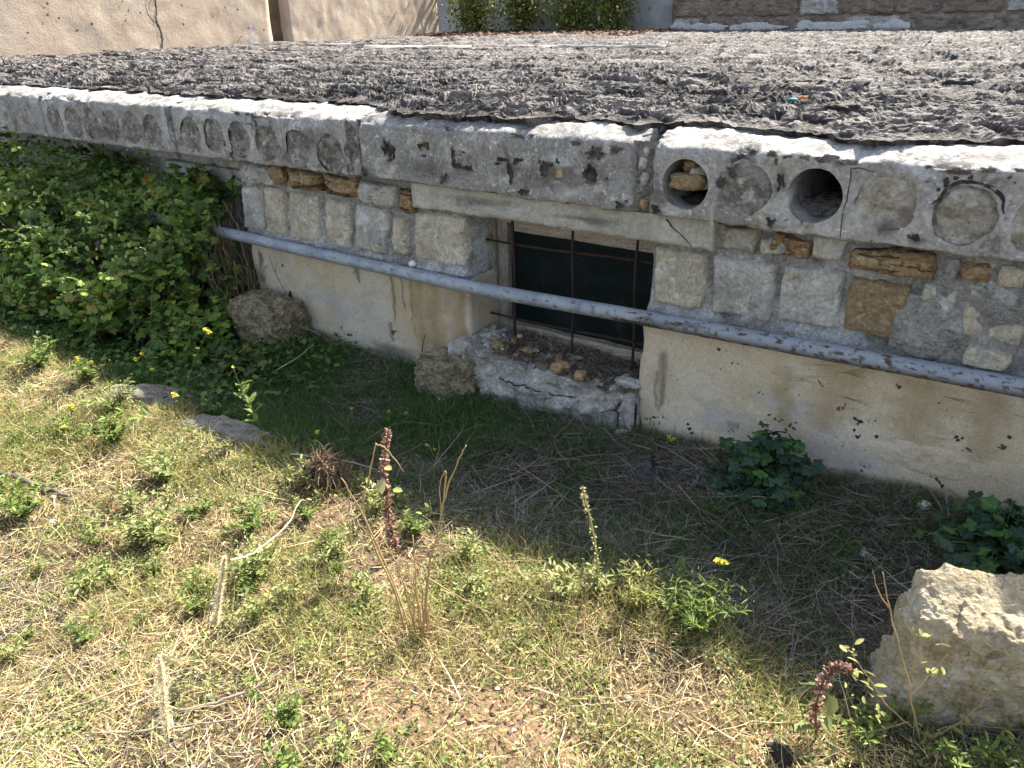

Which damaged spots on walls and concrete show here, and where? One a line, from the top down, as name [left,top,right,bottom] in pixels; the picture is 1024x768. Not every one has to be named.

crack [145,0,164,49]
spalling [380,138,395,162]
spalling [440,146,472,185]
spalling [495,157,523,185]
spalling [538,158,563,180]
spalling [582,145,608,183]
crack [839,167,874,237]
corrosion [627,312,783,349]
corrosion [861,354,928,380]
crack [499,377,576,400]
crack [599,402,621,428]